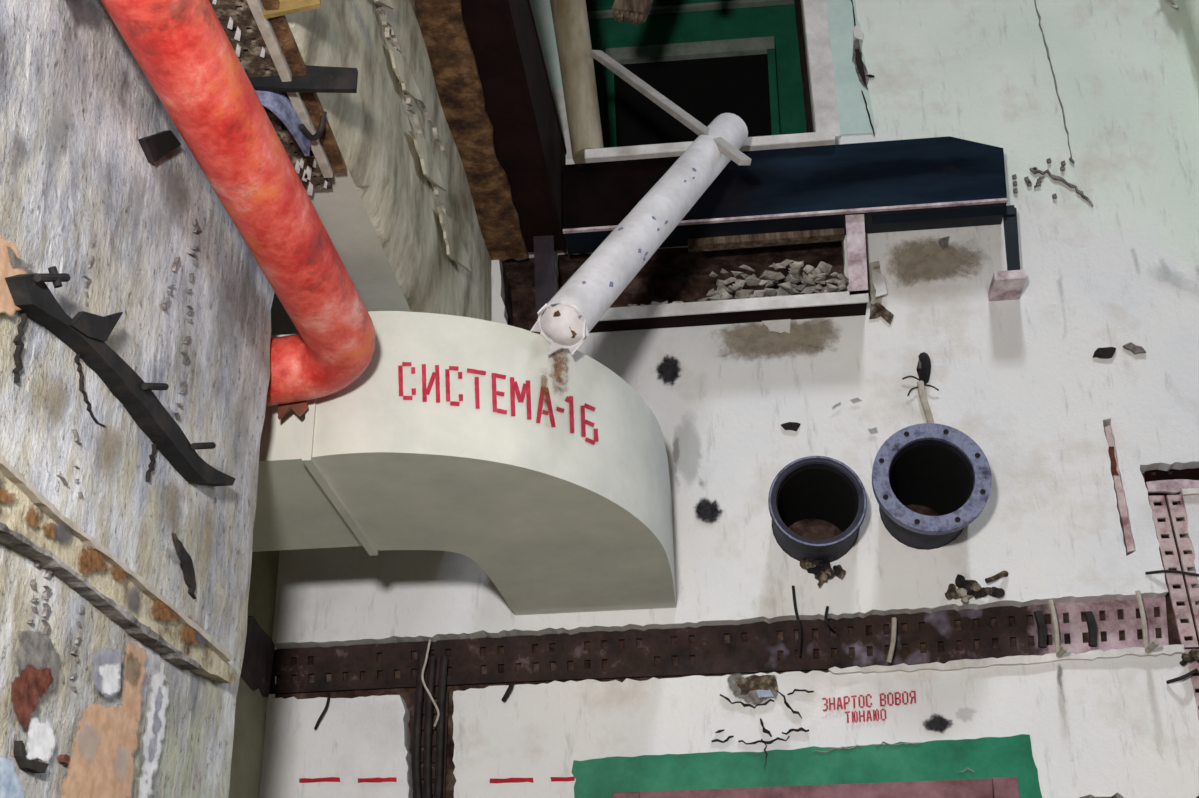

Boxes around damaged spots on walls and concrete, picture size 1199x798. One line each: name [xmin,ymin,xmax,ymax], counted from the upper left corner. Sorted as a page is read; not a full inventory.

crack [373,0,472,272]
crack [1012,0,1093,207]
crack [12,313,27,383]
crack [56,354,106,497]
crack [146,444,157,482]
spalling [167,533,197,599]
peeling [0,630,169,798]
spalling [720,673,814,719]